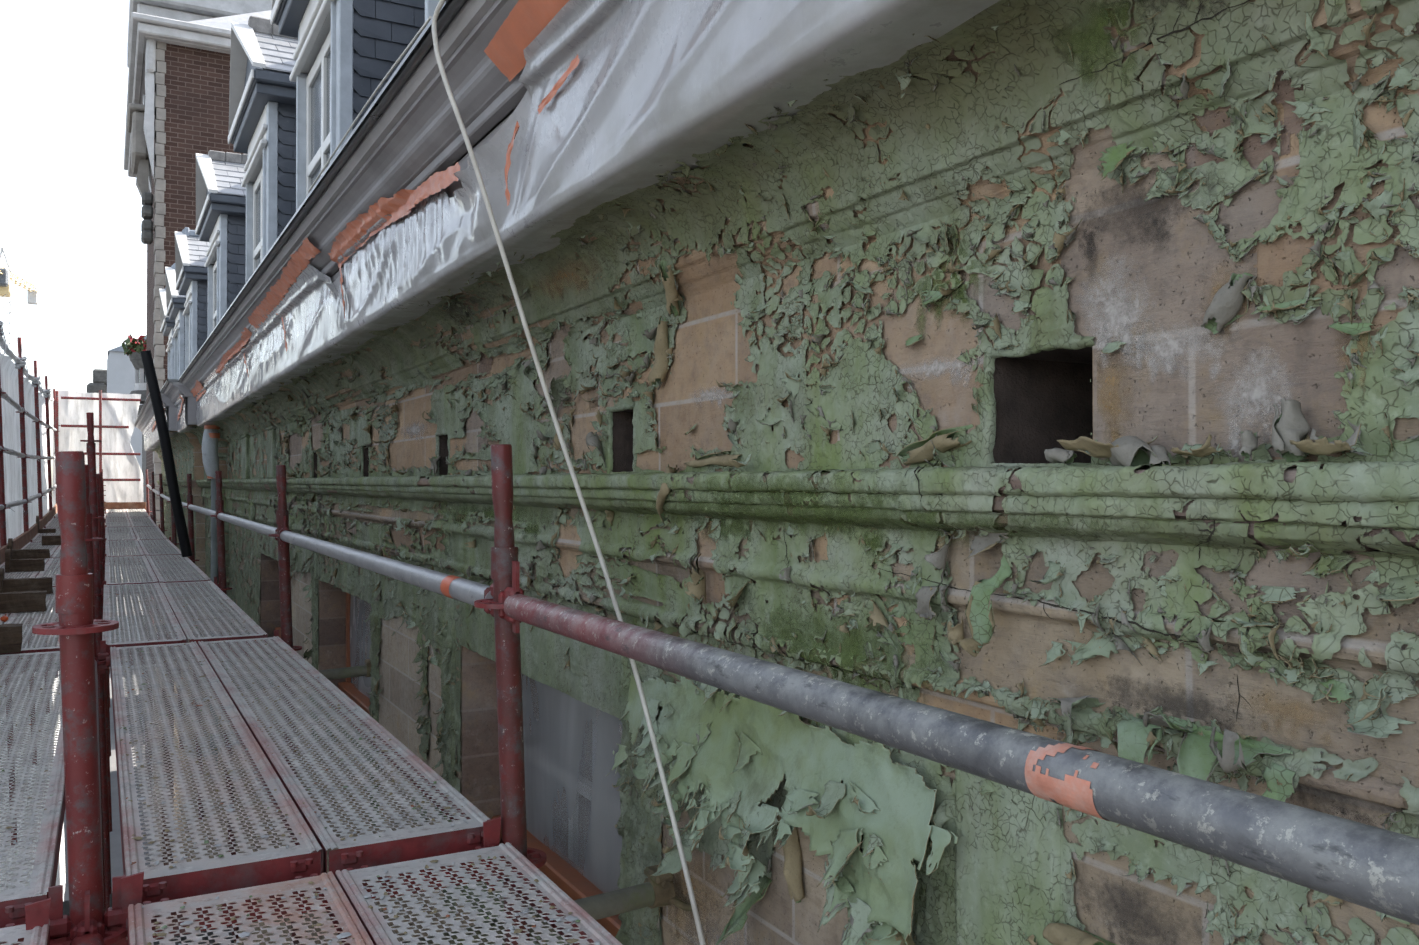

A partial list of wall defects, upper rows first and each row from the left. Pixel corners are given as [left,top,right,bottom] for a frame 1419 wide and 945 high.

crack [1059,0,1250,85]
peeling [251,6,1419,778]
crack [905,467,923,502]
crack [1194,515,1228,561]
peeling [513,505,1419,832]
peeling [371,745,441,841]
peeling [638,798,850,945]